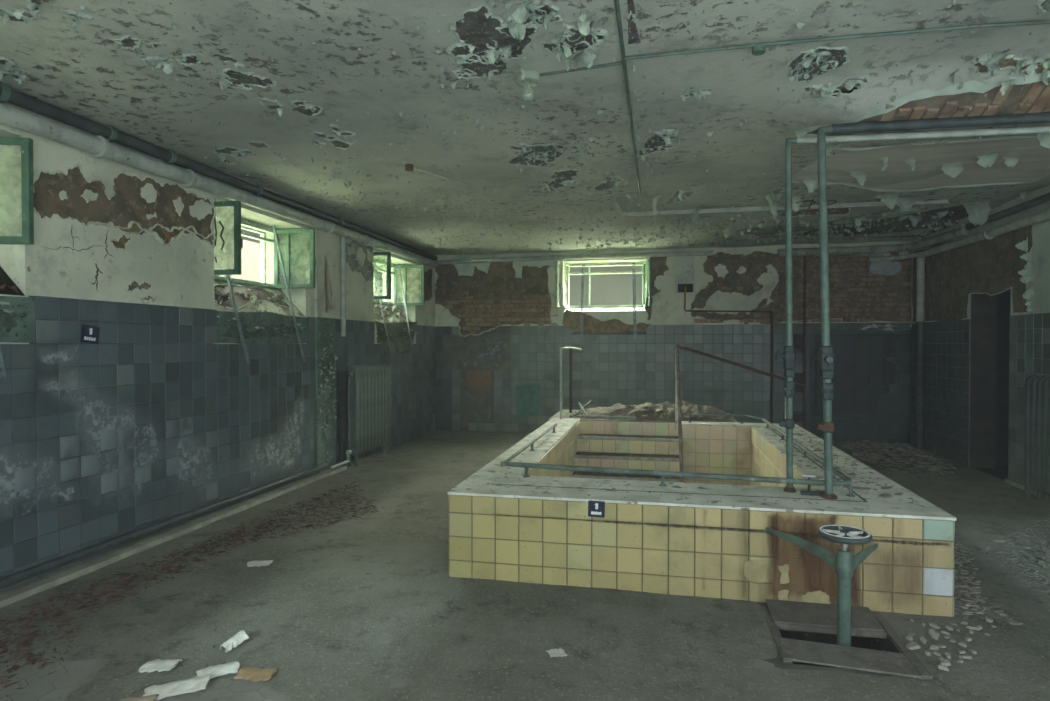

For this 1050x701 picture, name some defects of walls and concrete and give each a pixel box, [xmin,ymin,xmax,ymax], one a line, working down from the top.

flaking render [33,163,216,252]
damp [247,399,303,475]